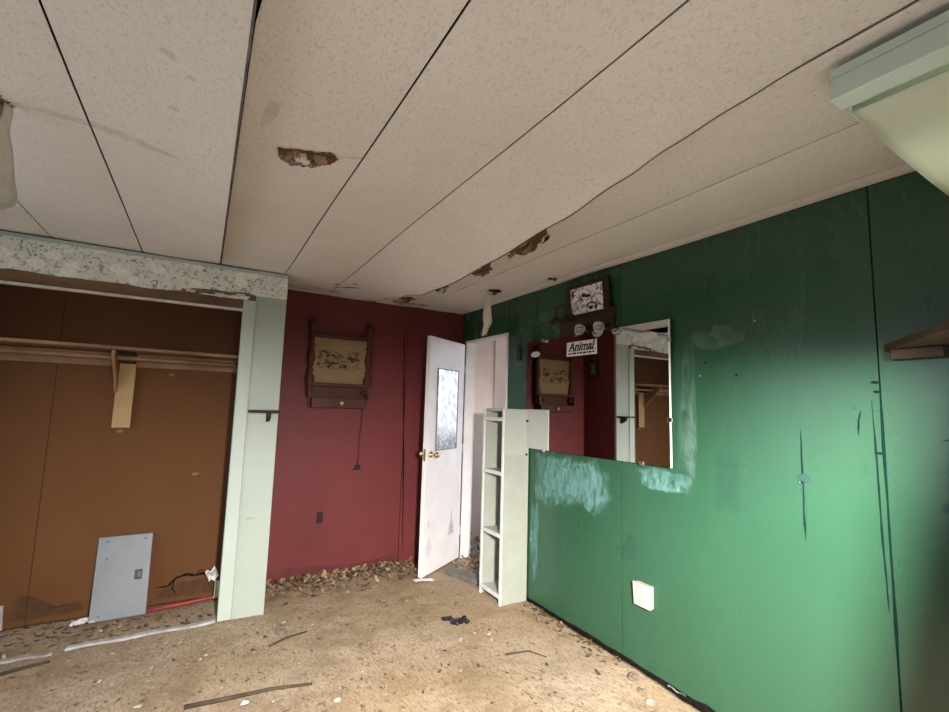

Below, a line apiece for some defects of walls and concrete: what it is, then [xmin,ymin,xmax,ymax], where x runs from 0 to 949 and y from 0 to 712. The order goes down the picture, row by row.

peeling [278,147,335,167]
peeling [507,235,550,259]